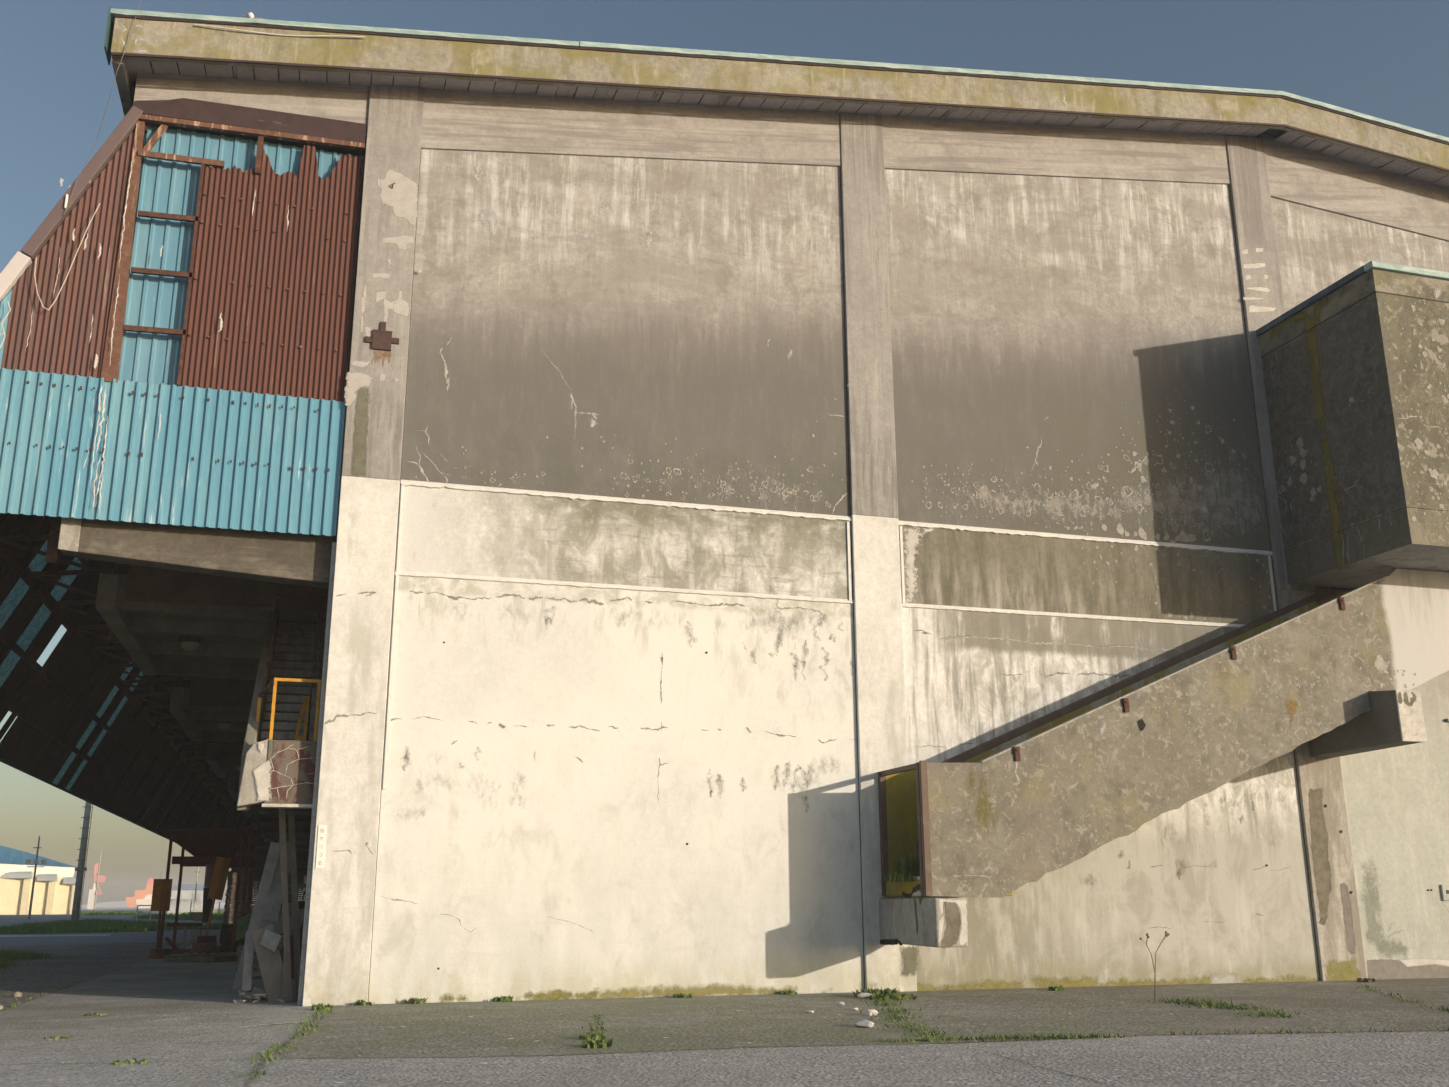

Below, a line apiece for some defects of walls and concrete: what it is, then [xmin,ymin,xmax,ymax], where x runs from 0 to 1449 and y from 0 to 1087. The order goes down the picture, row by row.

peeling [360,169,418,337]
water stain [957,445,1265,548]
crack [410,591,821,613]